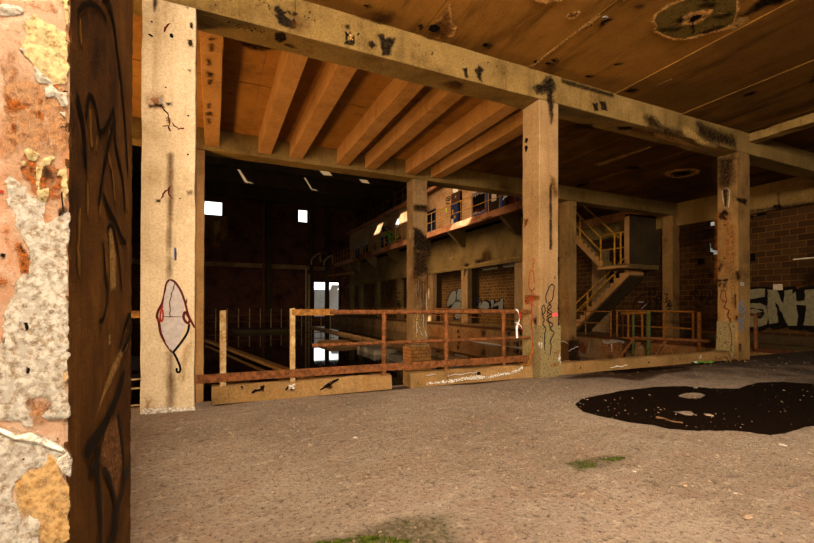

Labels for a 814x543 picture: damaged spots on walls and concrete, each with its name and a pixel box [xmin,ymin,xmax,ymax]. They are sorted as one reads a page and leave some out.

peeling [20,0,70,128]
leakage [651,0,740,40]
peeling [0,176,71,427]
peeling [0,434,71,543]